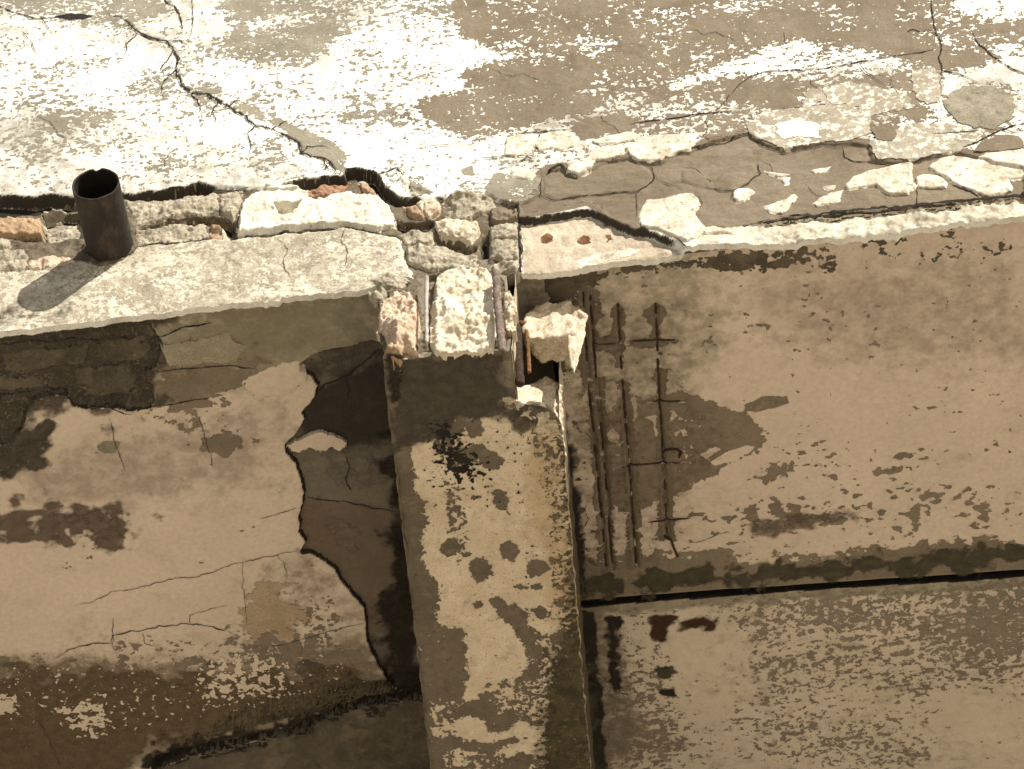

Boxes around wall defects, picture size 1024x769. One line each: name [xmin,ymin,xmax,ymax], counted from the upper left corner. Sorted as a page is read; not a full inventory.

crack [0,0,427,206]
peeling [0,0,1024,242]
crack [427,0,977,273]
crack [971,30,1024,74]
crack [56,550,301,658]
water stain [0,354,544,769]
crack [270,616,409,657]
spalling [0,224,1024,769]
corrosion [648,615,718,643]